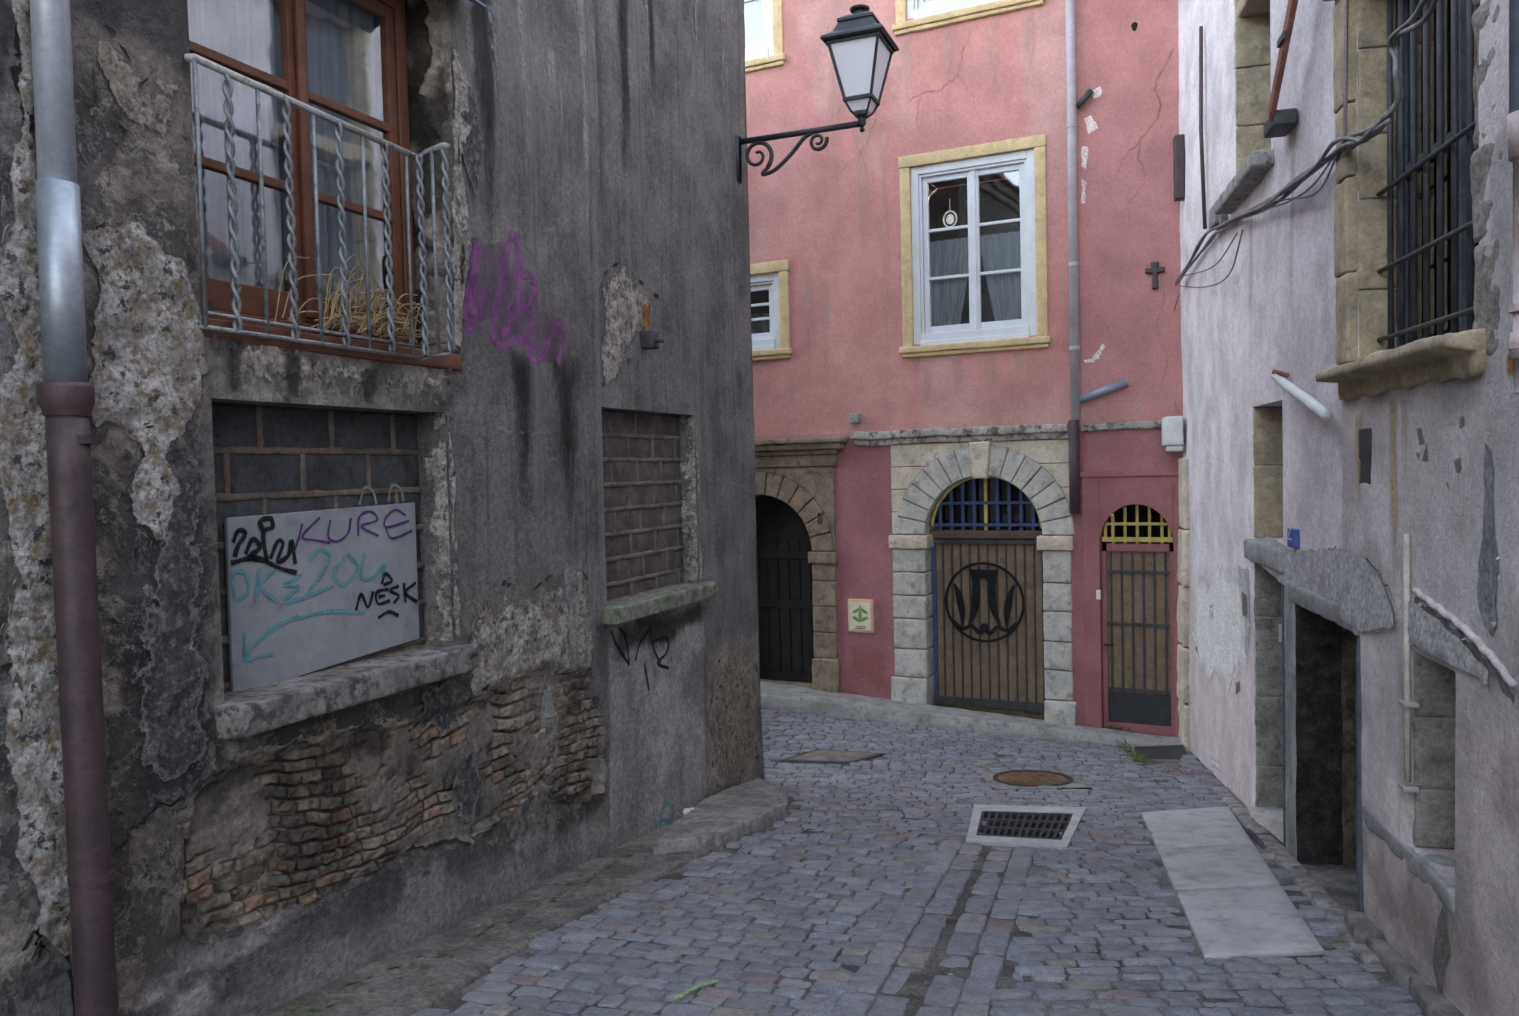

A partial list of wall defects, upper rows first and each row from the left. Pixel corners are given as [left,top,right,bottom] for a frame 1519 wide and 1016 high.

flaking render [92,25,189,142]
peeling [451,49,472,347]
flaking render [600,263,659,386]
flaking render [0,0,72,997]
flaking render [82,221,608,944]